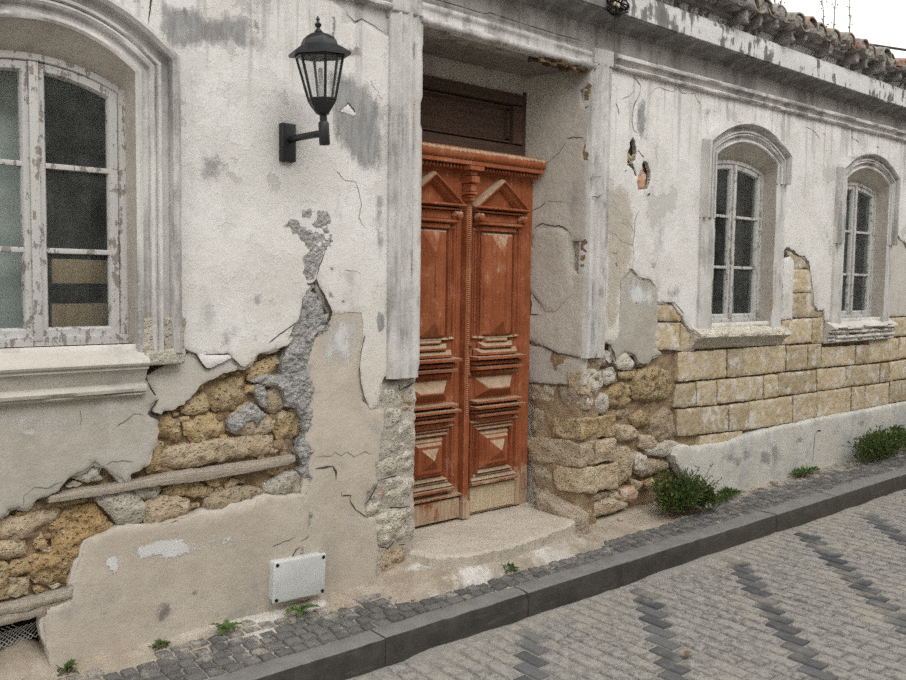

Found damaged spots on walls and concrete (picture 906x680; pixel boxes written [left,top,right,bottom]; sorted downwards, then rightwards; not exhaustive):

leakage [161,5,258,47]
spalling [637,166,646,190]
spalling [527,250,906,517]
spalling [0,355,302,600]
crack [315,451,410,518]